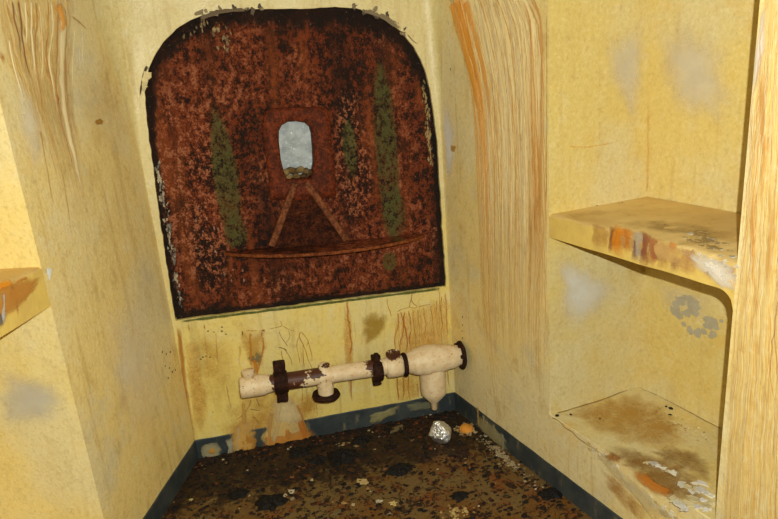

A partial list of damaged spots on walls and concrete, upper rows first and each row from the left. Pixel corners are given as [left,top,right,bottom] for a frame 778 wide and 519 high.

corrosion [604,228,690,264]
spalling [681,230,739,288]
leakage [365,316,384,340]
corrosion [394,288,448,354]
peeling [587,442,717,519]